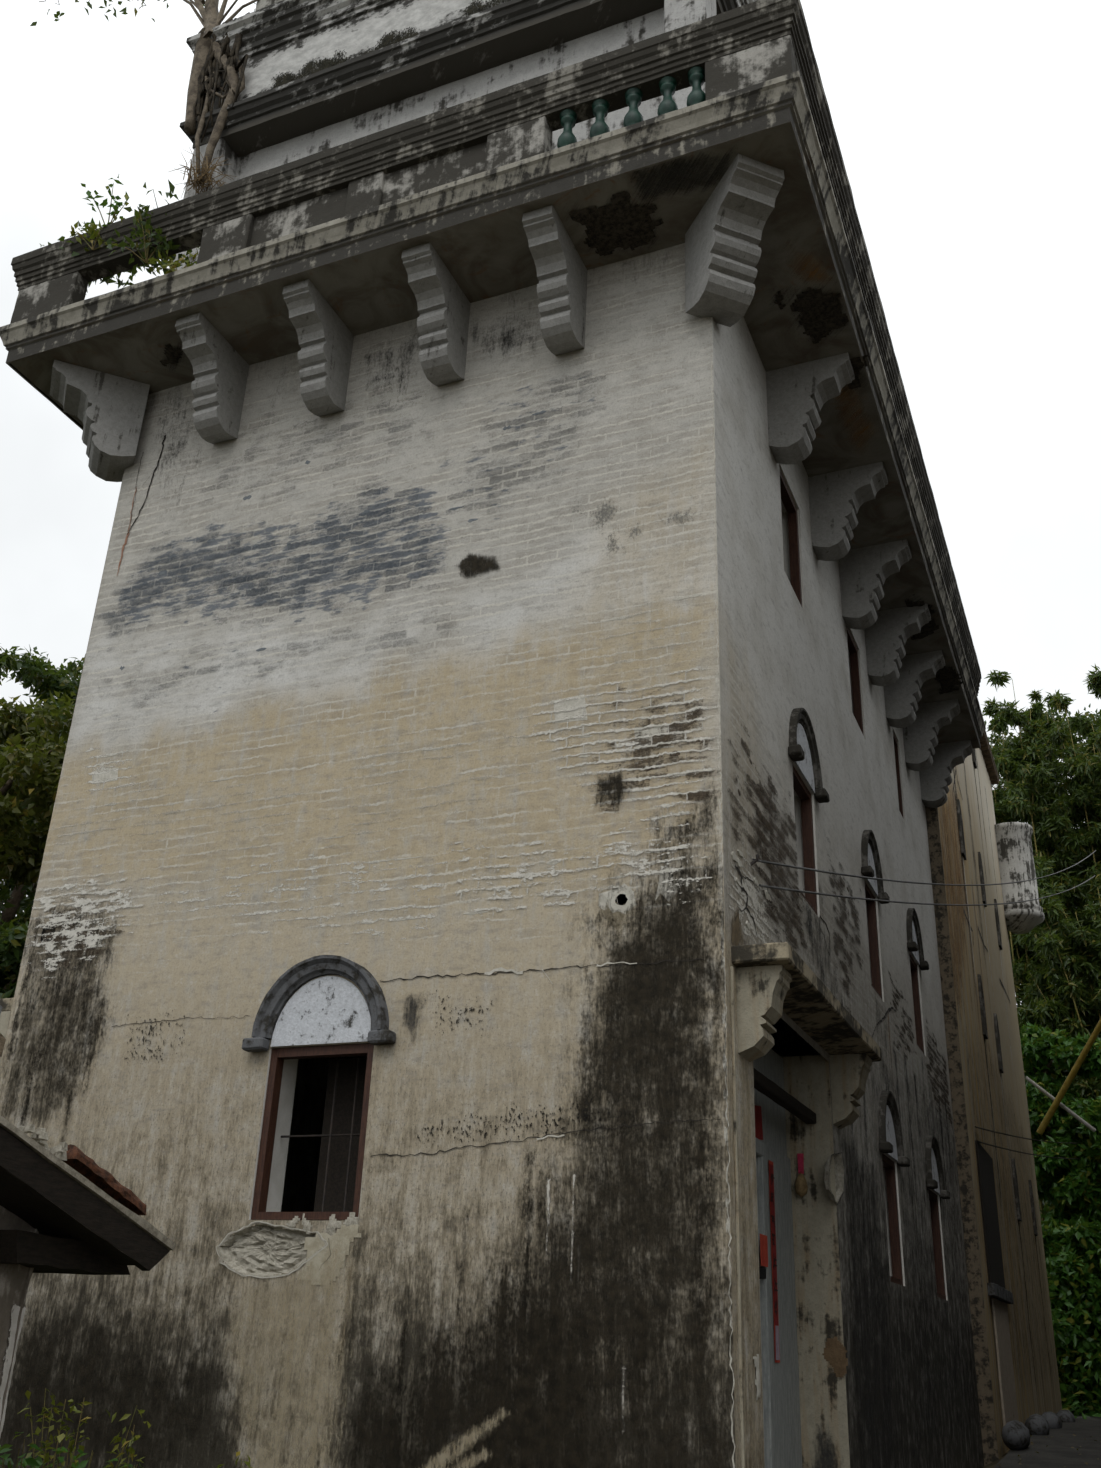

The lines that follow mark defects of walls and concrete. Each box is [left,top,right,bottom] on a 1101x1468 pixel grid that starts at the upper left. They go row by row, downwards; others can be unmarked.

crack [127,435,166,535]
leakage [3,898,115,1142]
flaking render [26,362,863,1468]
leakage [352,797,732,1468]
crack [381,958,704,983]
leakage [842,1043,972,1468]
leakage [812,1429,838,1468]